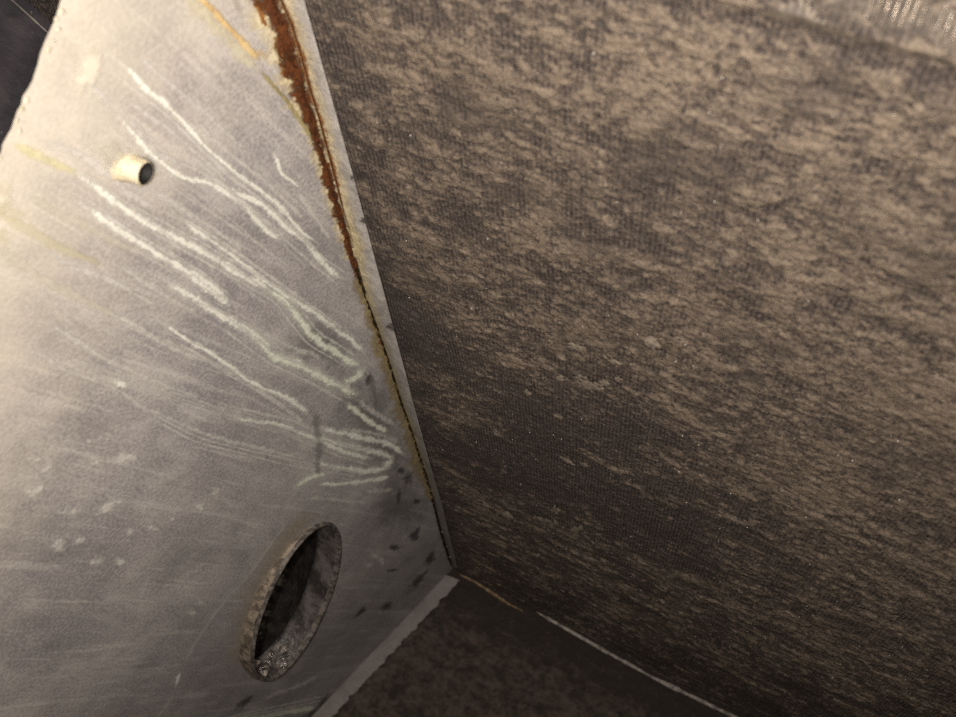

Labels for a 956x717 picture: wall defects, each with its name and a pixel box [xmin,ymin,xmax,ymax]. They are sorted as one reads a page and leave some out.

leakage [78,54,108,102]
leakage [0,145,410,504]
leakage [123,59,345,282]
corrosion [189,0,428,473]